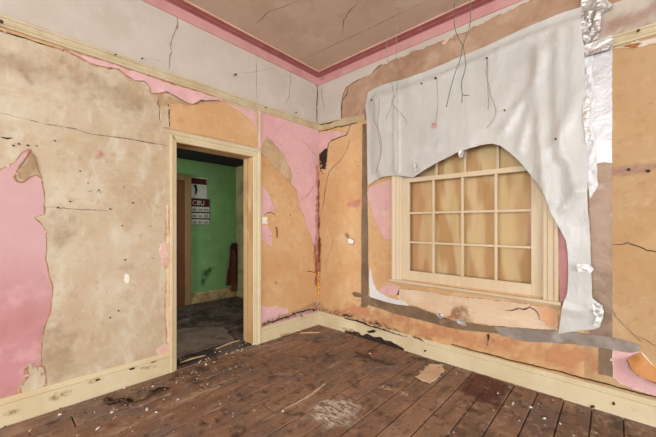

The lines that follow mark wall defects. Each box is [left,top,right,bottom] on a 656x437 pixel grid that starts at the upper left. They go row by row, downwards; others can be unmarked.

peeling [55,44,225,129]
crack [151,18,178,68]
flaking render [341,0,581,120]
crack [2,113,167,146]
spalling [261,137,292,184]
crack [303,64,382,214]
peeling [367,179,392,241]
peeling [0,149,53,399]
flaking render [379,228,568,330]
crack [612,242,656,252]
damp [334,306,462,341]
peeling [610,350,656,396]